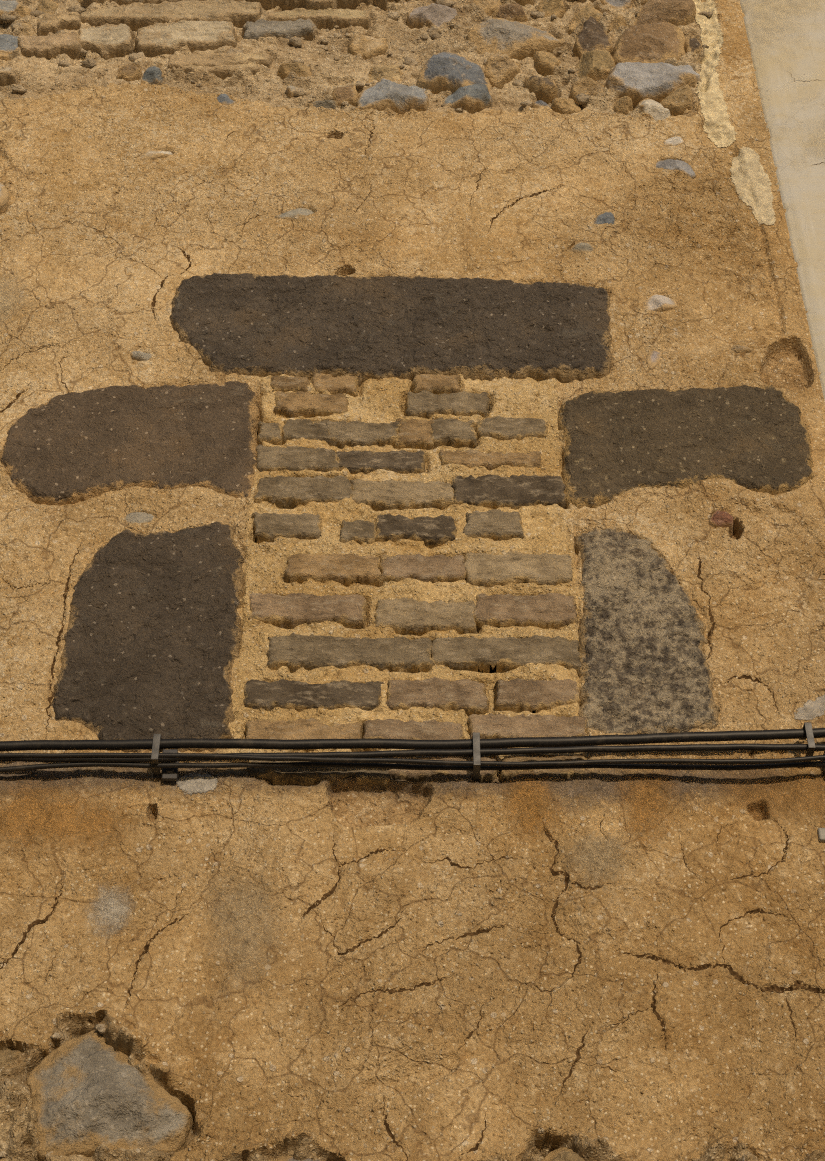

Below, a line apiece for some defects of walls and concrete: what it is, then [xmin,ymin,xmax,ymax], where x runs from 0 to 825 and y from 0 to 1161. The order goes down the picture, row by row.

crack [0,345,69,412]
crack [0,544,81,740]
crack [0,877,63,969]
crack [123,889,189,1010]
crack [340,973,454,1006]
crack [302,830,516,955]
crack [422,819,825,1092]
spalling [0,1010,201,1161]
spalling [221,1132,345,1161]
crack [383,1095,408,1161]
spalling [477,1131,629,1161]
spalling [692,1142,772,1161]